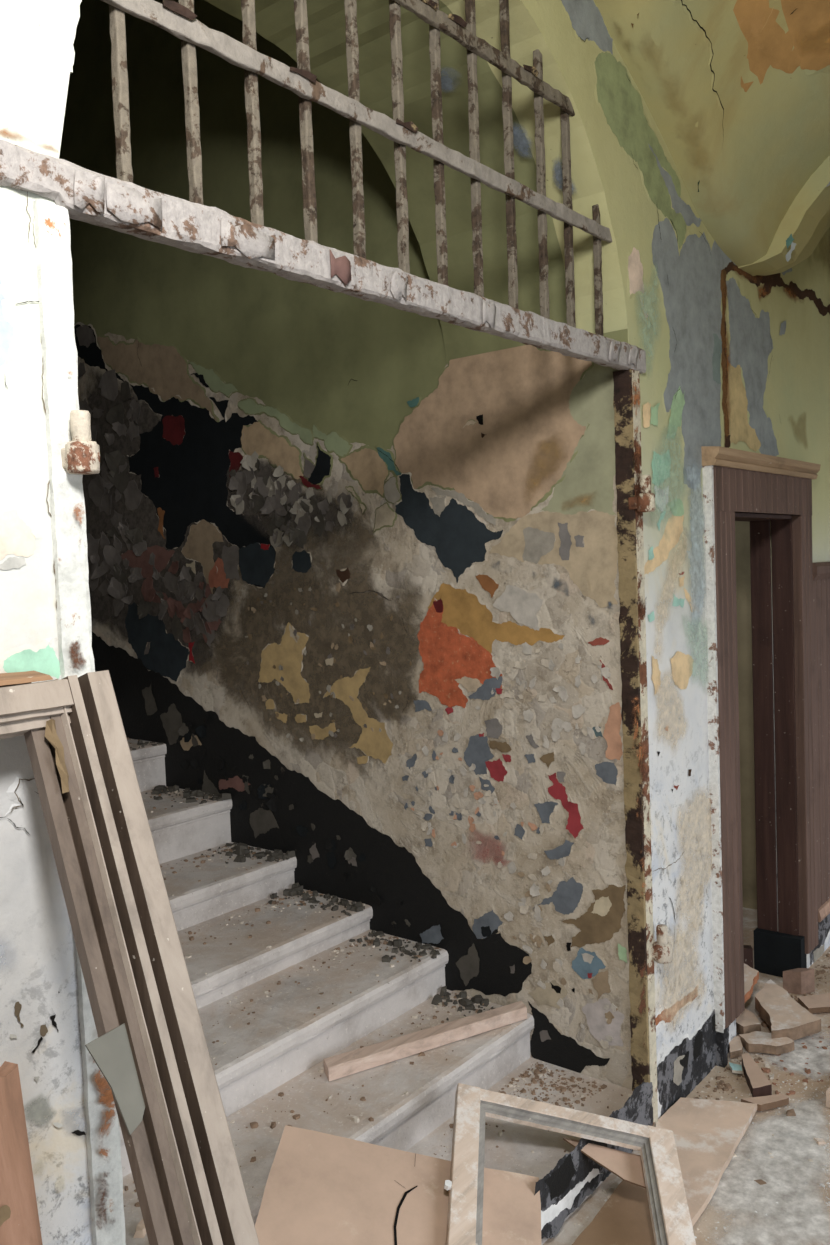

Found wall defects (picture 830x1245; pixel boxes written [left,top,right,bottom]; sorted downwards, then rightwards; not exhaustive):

crack [672,0,724,139]
spalling [733,0,830,100]
crack [26,191,36,249]
peeling [560,0,786,578]
corrosion [720,262,830,448]
corrosion [631,379,642,494]
damp [82,373,420,772]
peeling [74,322,629,1073]
peeling [652,651,694,694]
crack [0,776,38,836]
corrosion [633,697,646,839]
corrosion [638,962,646,1014]